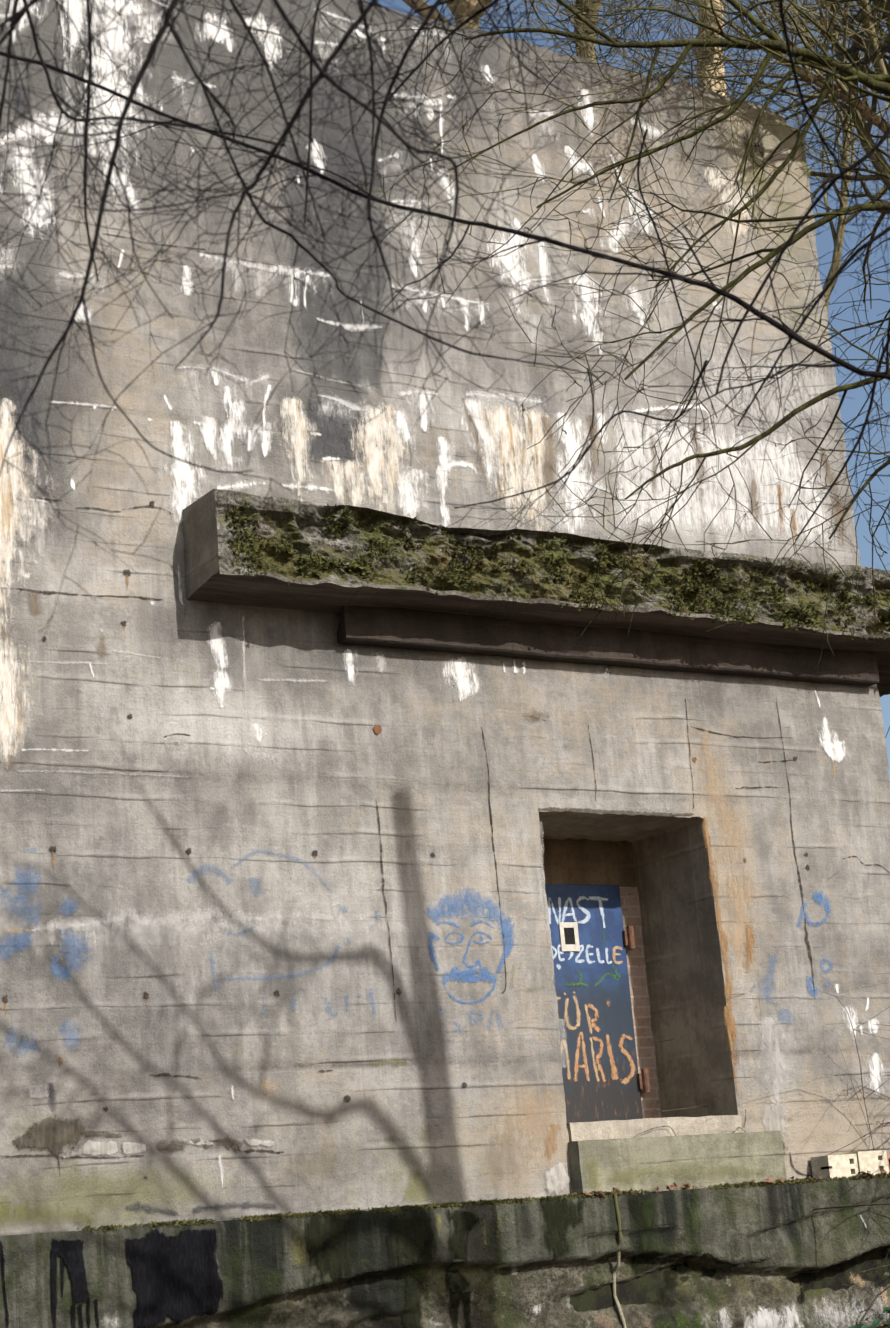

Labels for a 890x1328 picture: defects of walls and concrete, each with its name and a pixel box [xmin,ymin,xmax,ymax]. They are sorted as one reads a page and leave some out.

water stain [0,0,164,236]
efflorescence [197,13,232,52]
efflorescence [246,14,282,71]
water stain [200,41,489,383]
water stain [487,218,550,346]
water stain [704,168,756,238]
water stain [0,286,88,762]
water stain [164,352,844,542]
crack [376,801,397,1019]
crack [481,727,507,993]
rust [703,817,755,1077]
crack [685,699,815,995]